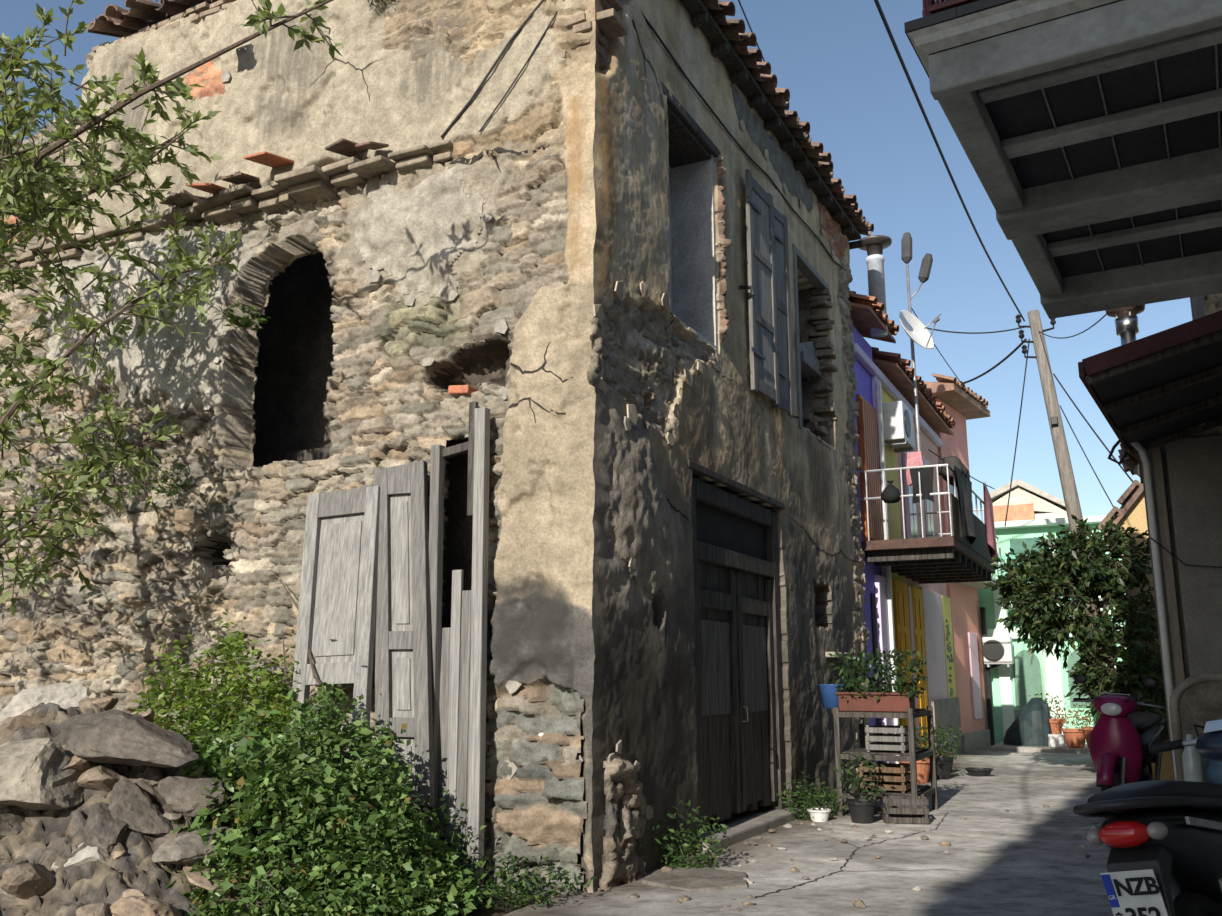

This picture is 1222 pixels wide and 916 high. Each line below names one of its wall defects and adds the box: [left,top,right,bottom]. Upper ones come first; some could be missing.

flaking render [181,43,257,108]
peeling [70,228,229,410]
peeling [354,164,494,306]
flaking render [422,319,512,401]
crack [509,341,573,419]
flaking render [587,155,732,446]
hole [185,535,234,571]
crack [791,516,861,578]
flaking render [485,676,587,897]
flaking render [598,740,653,891]